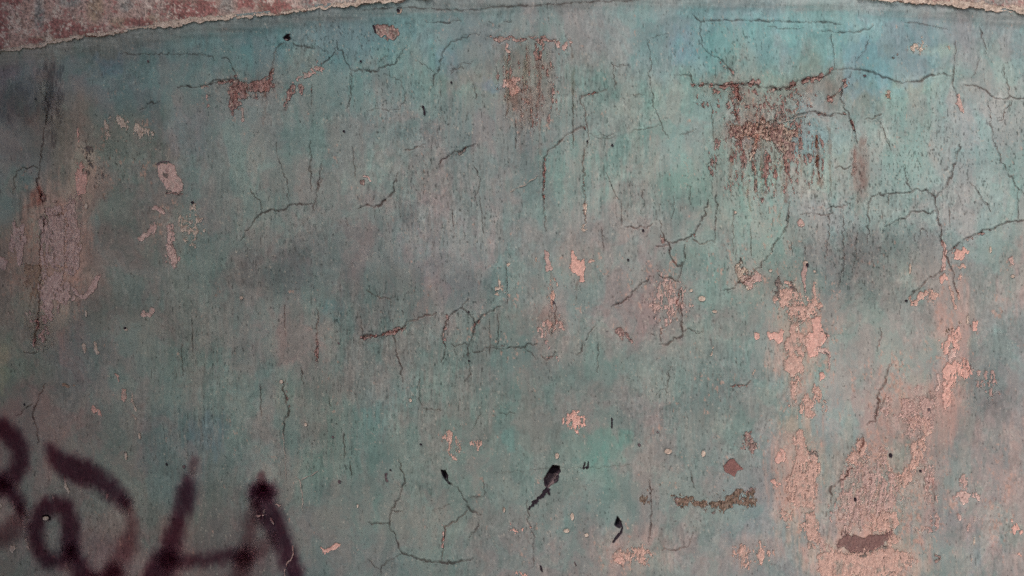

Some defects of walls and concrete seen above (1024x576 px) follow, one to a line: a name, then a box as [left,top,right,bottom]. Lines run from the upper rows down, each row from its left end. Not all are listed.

peeling [372,9,402,41]
crack [690,17,1024,299]
peeling [0,128,104,350]
peeling [137,161,205,269]
crack [360,320,438,410]
crack [442,269,536,376]
peeling [562,410,586,435]
peeling [569,250,594,282]
crack [616,197,718,305]
peeling [648,270,717,327]
peeling [732,240,1000,576]
crack [372,463,479,564]